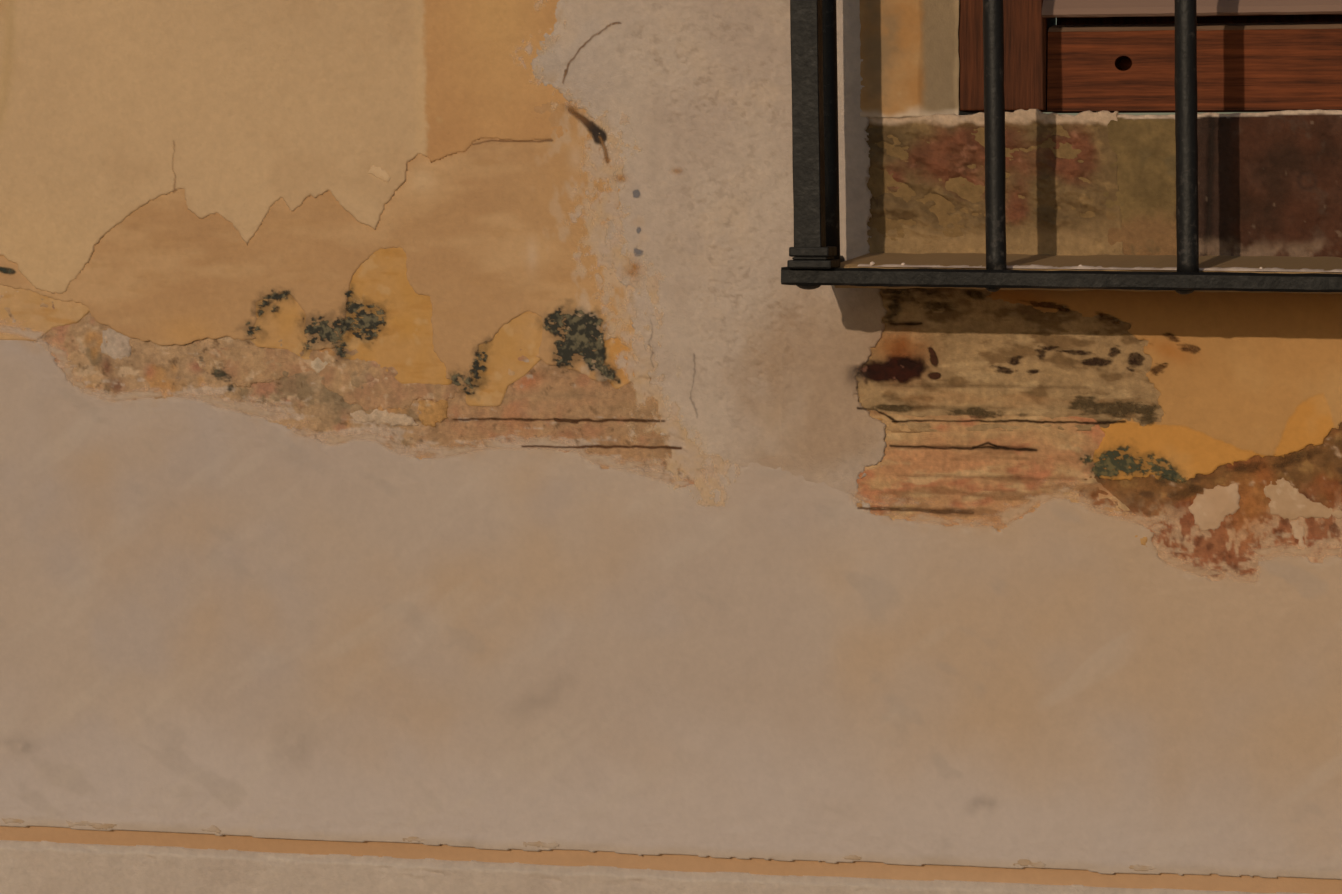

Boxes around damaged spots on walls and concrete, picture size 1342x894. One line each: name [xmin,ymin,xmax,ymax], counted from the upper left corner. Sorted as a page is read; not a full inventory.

damp [246,290,290,336]
damp [303,290,386,361]
peeling [0,102,717,487]
damp [451,341,488,395]
damp [543,308,620,383]
spalling [855,288,1342,581]
damp [1080,446,1198,495]